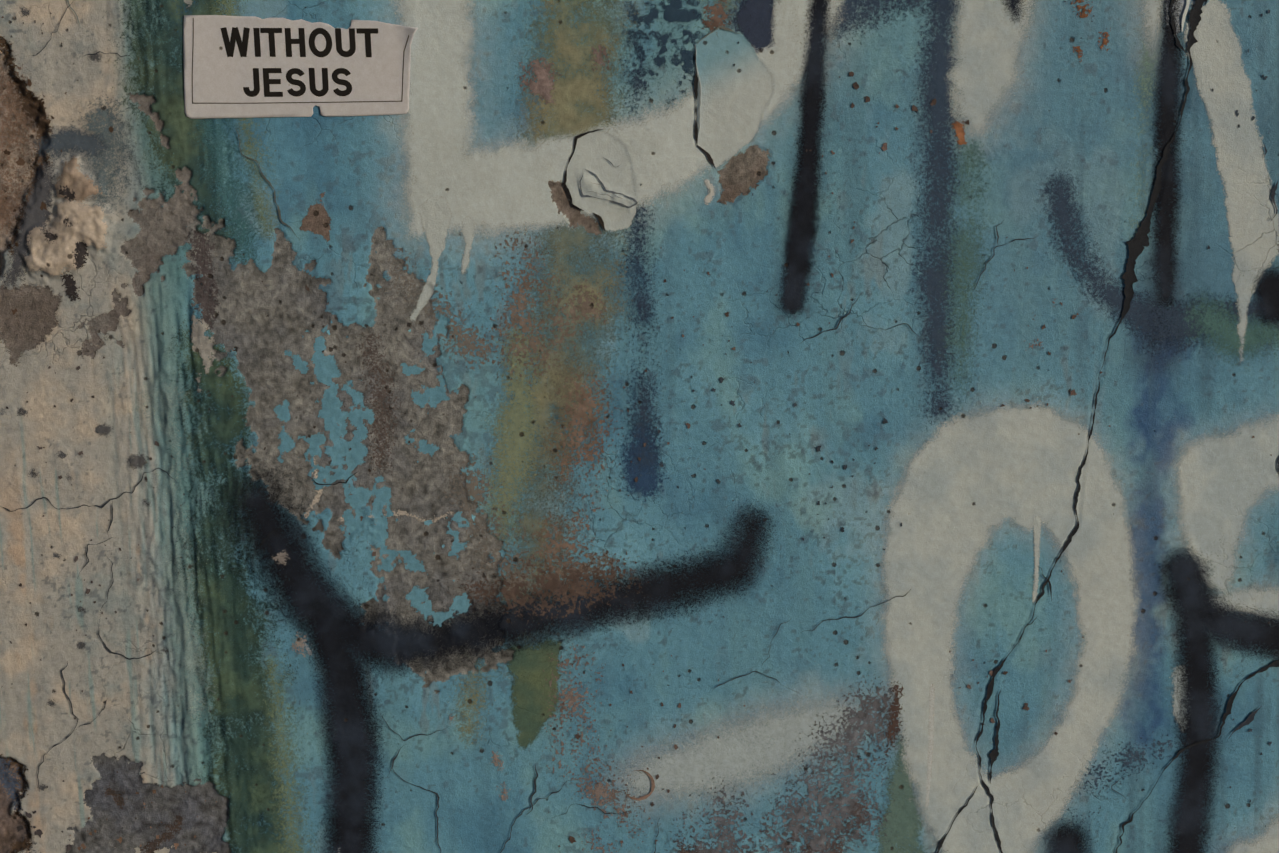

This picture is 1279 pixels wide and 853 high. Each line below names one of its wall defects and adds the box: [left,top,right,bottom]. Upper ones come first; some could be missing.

spalling [0,35,80,367]
peeling [548,129,642,237]
peeling [693,23,775,205]
crack [1263,144,1279,224]
crack [800,292,917,344]
peeling [61,166,909,853]
crack [936,0,1207,853]
spalling [0,754,43,853]
crack [1111,660,1279,853]